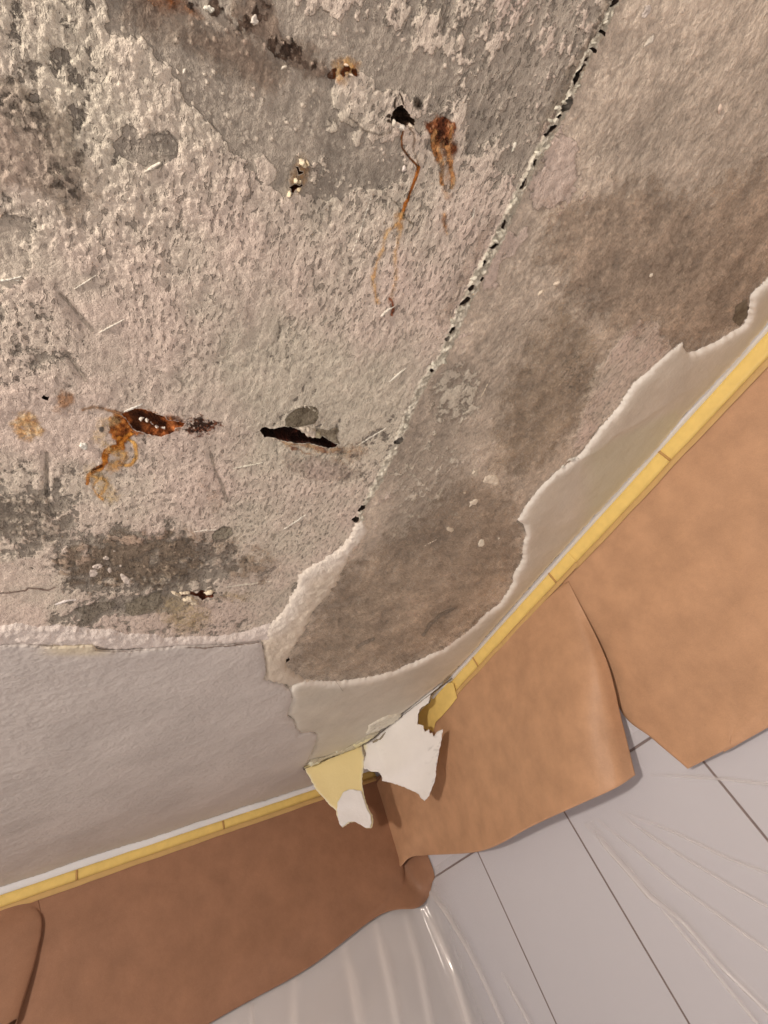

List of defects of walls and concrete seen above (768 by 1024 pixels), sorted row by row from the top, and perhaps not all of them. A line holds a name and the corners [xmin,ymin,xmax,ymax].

rust [372,116,457,317]
crack [349,0,620,524]
leakage [543,158,768,351]
rust [58,393,142,500]
rust [148,410,222,437]
leakage [53,529,231,589]
peeling [0,277,768,887]
leakage [293,480,520,676]